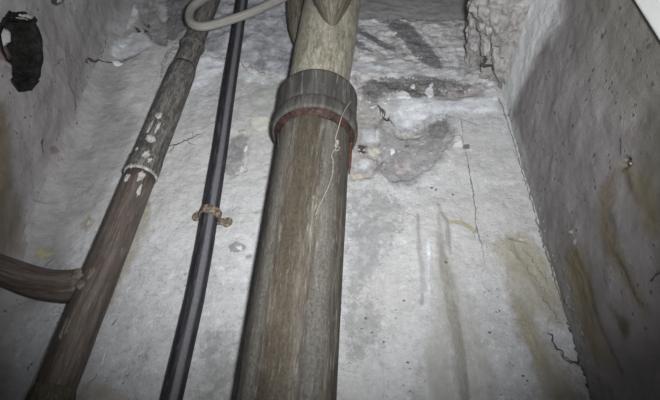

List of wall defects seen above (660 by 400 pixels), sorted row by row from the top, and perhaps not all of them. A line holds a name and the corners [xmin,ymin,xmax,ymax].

spalling [0,10,44,92]
crack [85,38,149,66]
peeling [350,75,500,198]
crack [446,117,486,264]
crack [498,97,600,399]